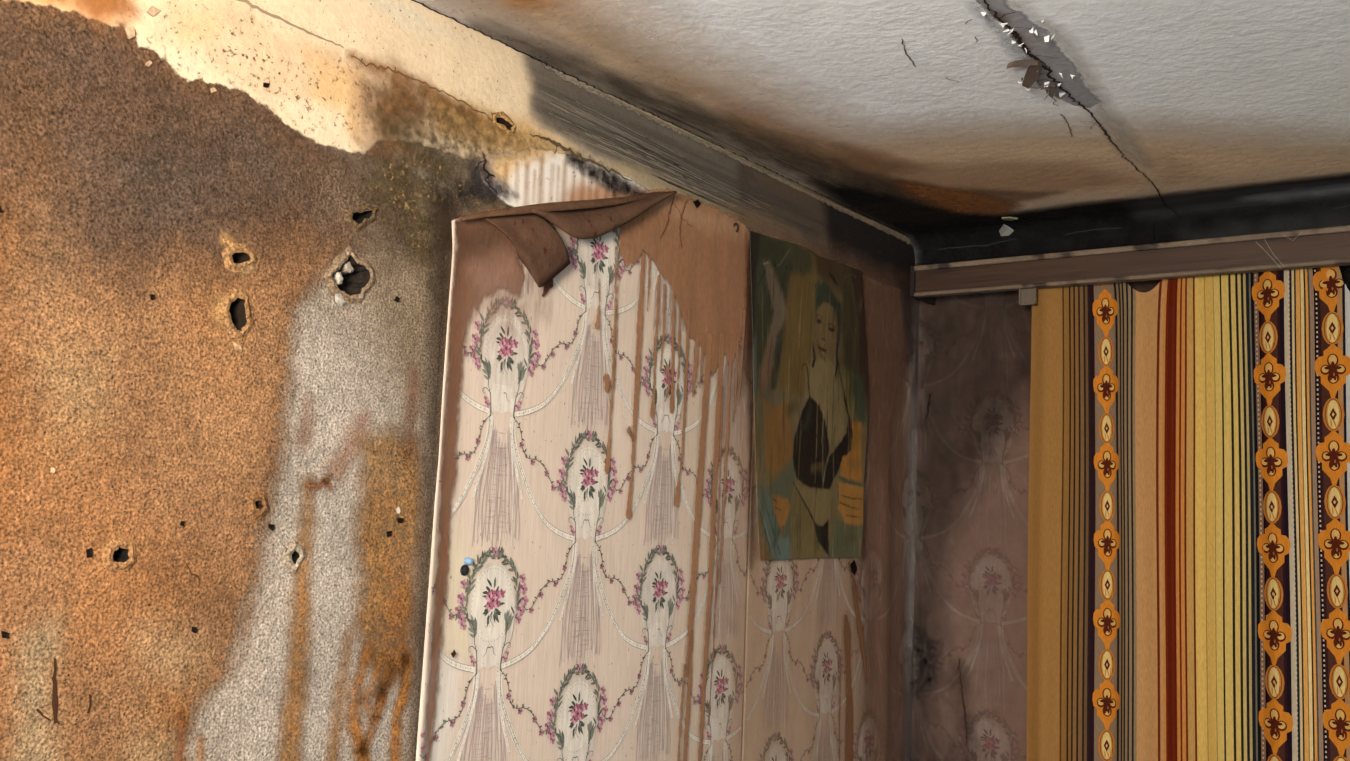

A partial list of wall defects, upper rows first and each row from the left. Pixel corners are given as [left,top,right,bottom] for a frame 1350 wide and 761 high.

spalling [113,547,129,562]
spalling [214,288,254,352]
water stain [0,0,531,761]
rust [280,474,332,761]
spalling [324,205,378,307]
rust [329,433,421,761]
peeling [6,0,915,290]
water stain [540,90,772,761]
water stain [430,0,1350,266]
crack [965,0,1179,241]